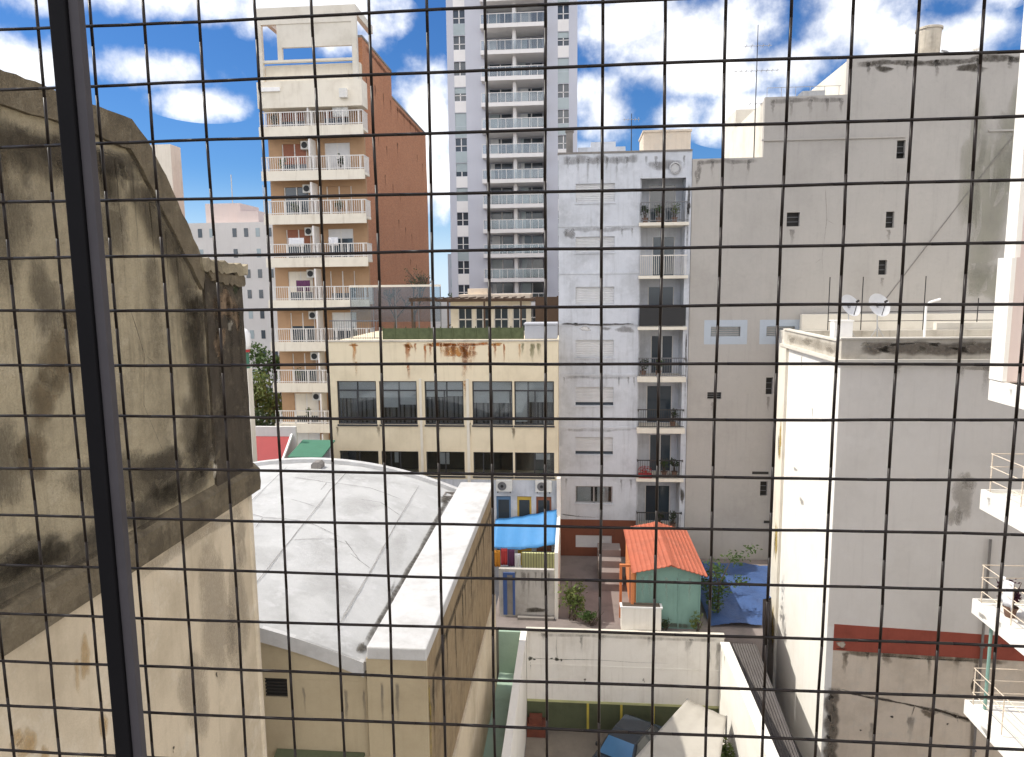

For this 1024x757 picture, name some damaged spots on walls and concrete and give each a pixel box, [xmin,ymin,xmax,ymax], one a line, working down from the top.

leakage [866,55,1020,72]
leakage [96,151,242,355]
leakage [35,302,77,420]
rust [405,342,505,370]
leakage [18,434,45,474]
leakage [127,369,209,528]
leakage [0,526,97,605]